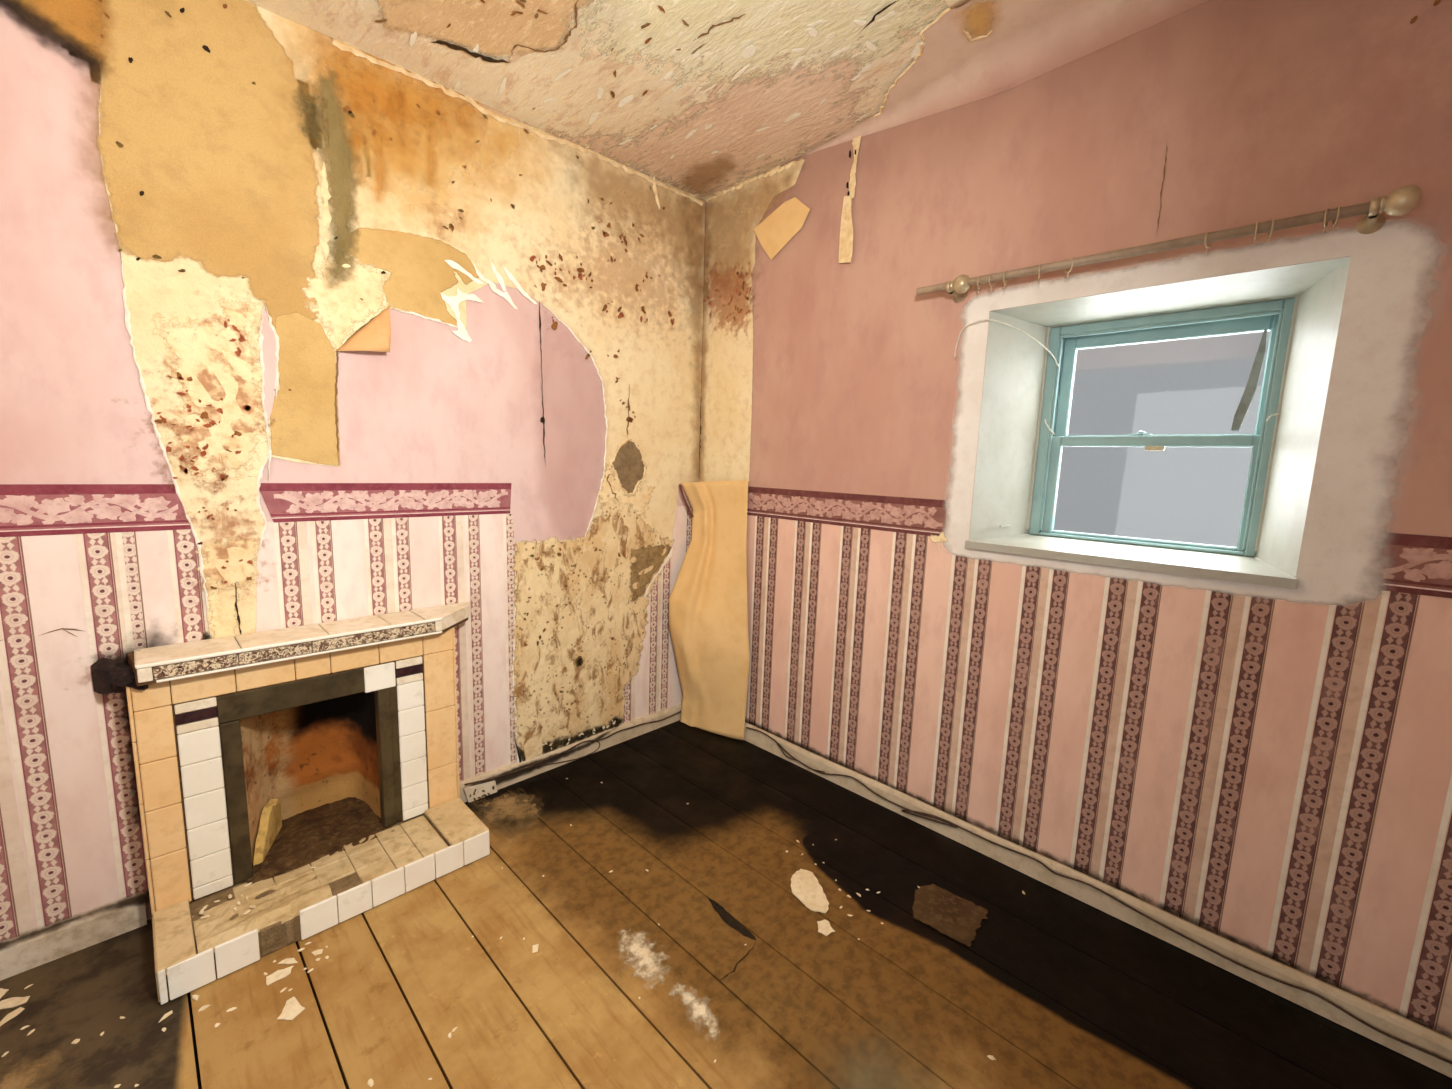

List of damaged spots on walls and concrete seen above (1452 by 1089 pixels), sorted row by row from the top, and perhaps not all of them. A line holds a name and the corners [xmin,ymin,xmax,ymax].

crack [431,0,579,63]
crack [692,14,745,54]
crack [863,0,899,29]
peeling [332,0,948,264]
water stain [299,49,518,284]
flaking render [530,254,593,291]
flaking render [602,272,660,323]
spalling [598,377,654,517]
peeling [524,542,576,646]